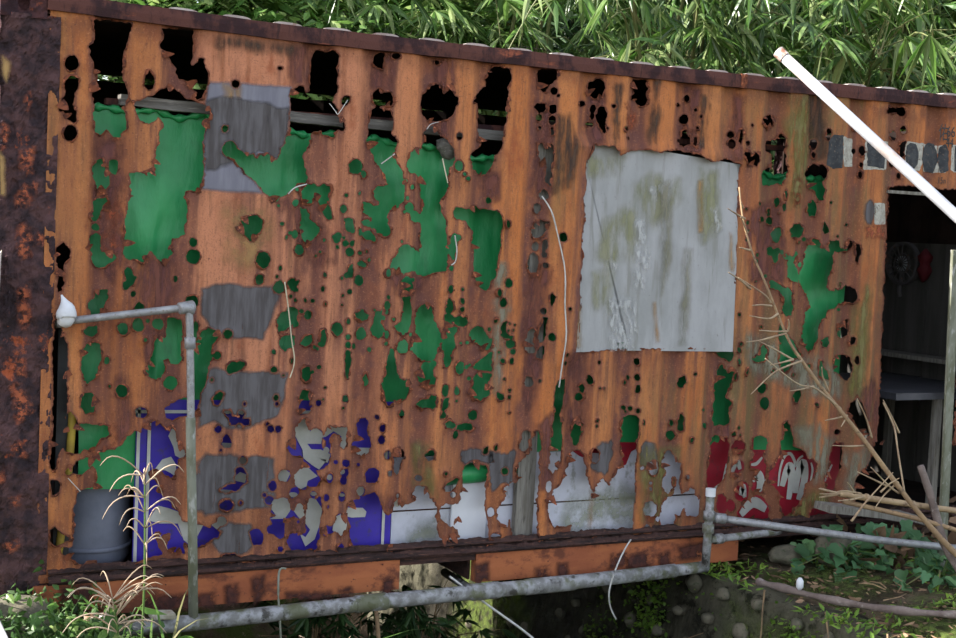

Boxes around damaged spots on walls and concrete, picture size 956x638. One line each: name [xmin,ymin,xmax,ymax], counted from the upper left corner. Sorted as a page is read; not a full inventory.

corrosion [16,148,37,204]
corrosion [646,86,755,166]
corrosion [18,285,31,327]
corrosion [88,120,211,406]
corrosion [234,52,512,433]
corrosion [481,87,557,409]
corrosion [714,139,901,392]
corrosion [484,297,625,541]
corrosion [266,425,460,543]
corrosion [474,562,489,583]
corrosion [536,564,568,578]
corrosion [610,542,703,568]